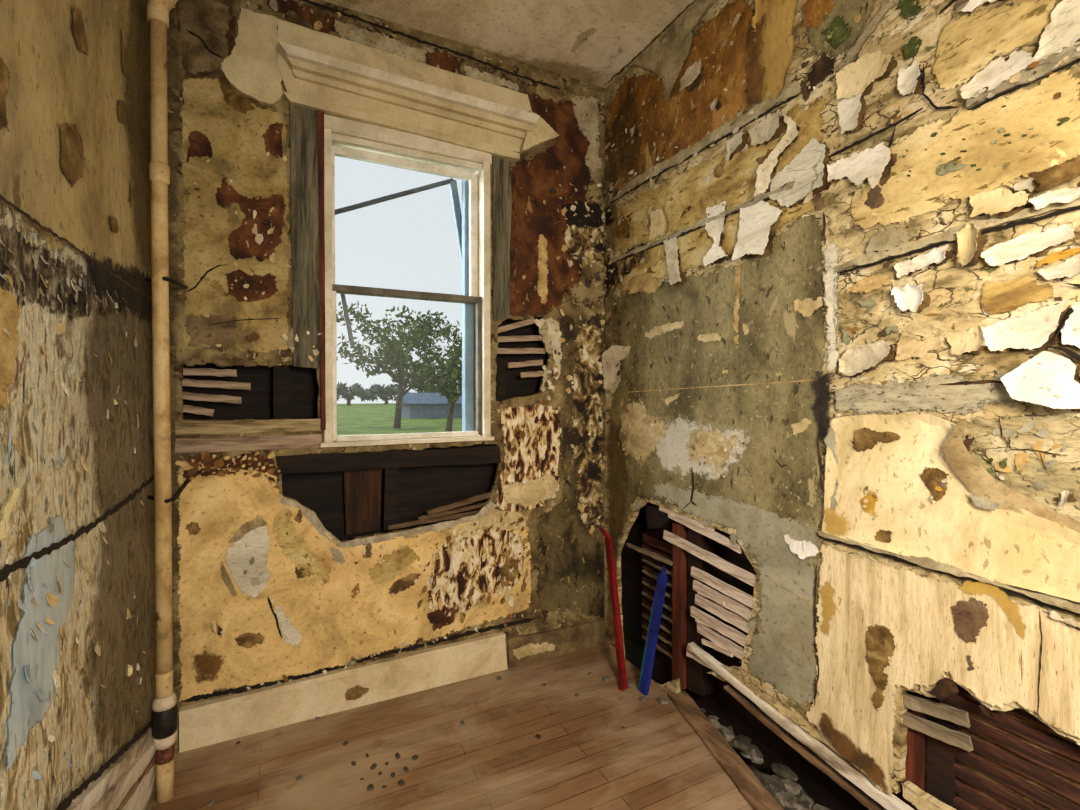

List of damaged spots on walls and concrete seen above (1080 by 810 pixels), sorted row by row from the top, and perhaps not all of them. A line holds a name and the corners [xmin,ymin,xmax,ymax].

leakage [167,1,179,103]
peeling [60,123,84,187]
peeling [0,204,104,281]
leakage [168,119,179,364]
leakage [0,0,156,749]
flaking render [175,0,1080,711]
leakage [170,379,180,536]
peeling [0,273,139,810]
crack [0,474,154,582]
leakage [172,621,181,708]
leakage [193,651,224,683]
spalling [902,678,1080,810]